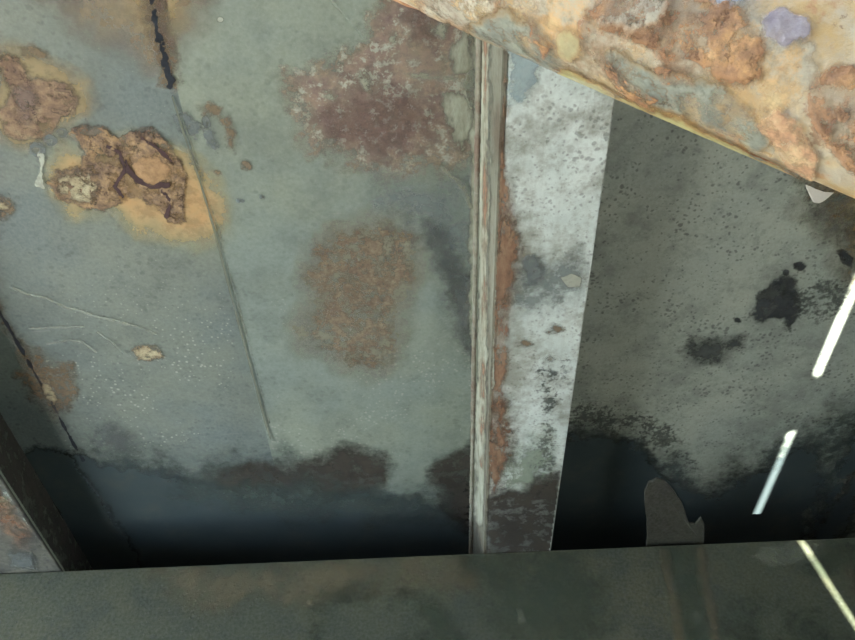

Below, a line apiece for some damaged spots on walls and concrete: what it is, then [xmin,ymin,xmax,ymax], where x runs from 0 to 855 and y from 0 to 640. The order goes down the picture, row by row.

rust [69,0,204,67]
rust [0,46,226,242]
crack [139,0,271,439]
rust [201,101,235,149]
rust [393,0,855,324]
crack [0,307,85,462]
rust [12,348,79,413]
peeling [131,345,164,361]
rust [489,142,524,494]
leakage [0,413,471,571]
leakage [485,369,855,640]